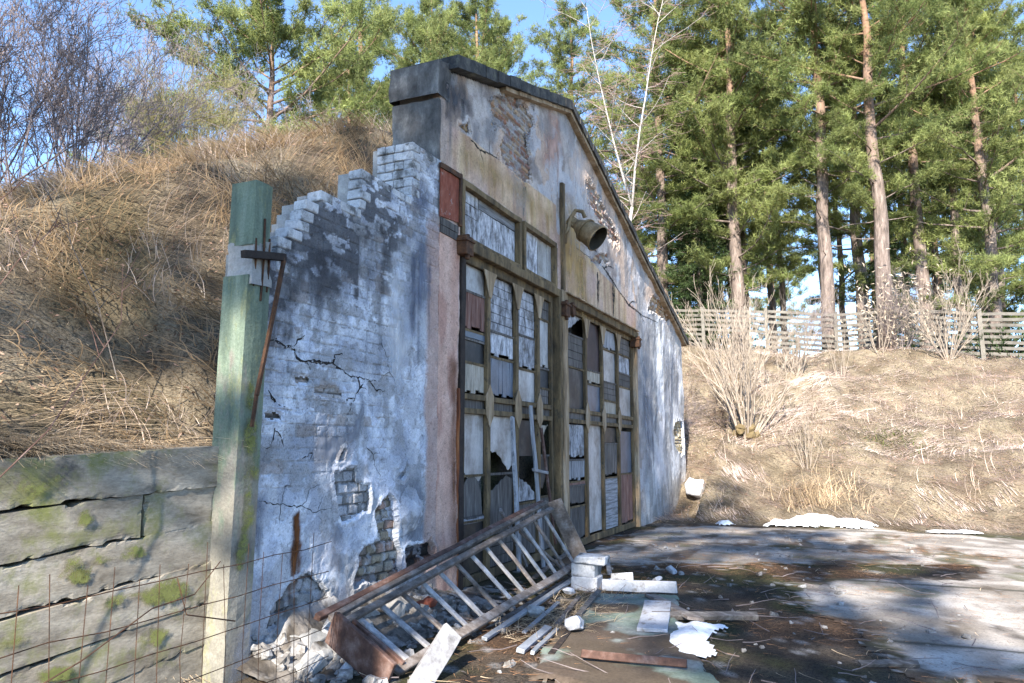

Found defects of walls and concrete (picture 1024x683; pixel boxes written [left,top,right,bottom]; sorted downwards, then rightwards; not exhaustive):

spalling [488,91,538,188]
spalling [584,173,621,268]
crack [270,335,398,420]
spalling [673,417,685,457]
corrosion [289,512,302,589]
crack [263,485,332,524]
spalling [330,458,411,596]
spalling [257,563,335,638]